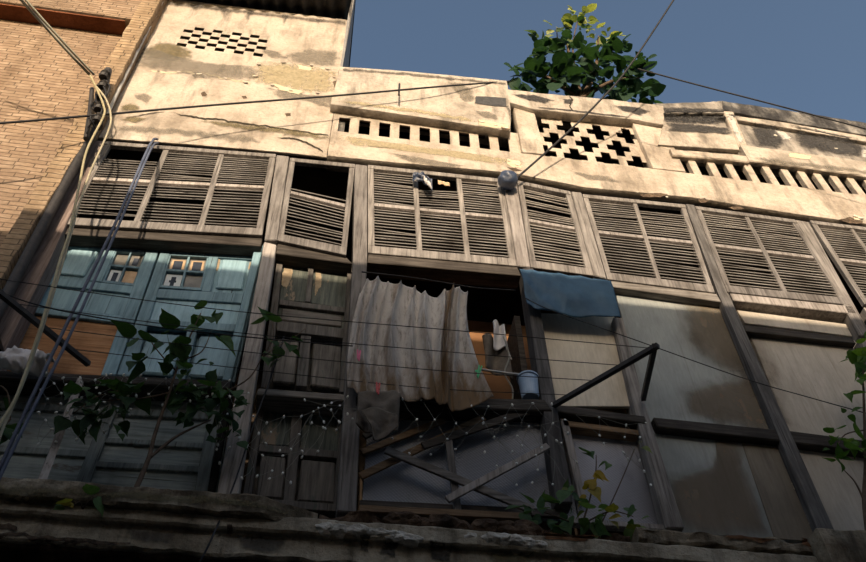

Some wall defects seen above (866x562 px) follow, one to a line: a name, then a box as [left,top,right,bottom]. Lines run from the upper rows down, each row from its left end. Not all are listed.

damp [137,48,254,78]
flaking render [150,62,336,94]
damp [264,50,337,65]
damp [278,91,332,107]
peeling [281,266,293,288]
damp [690,305,769,429]